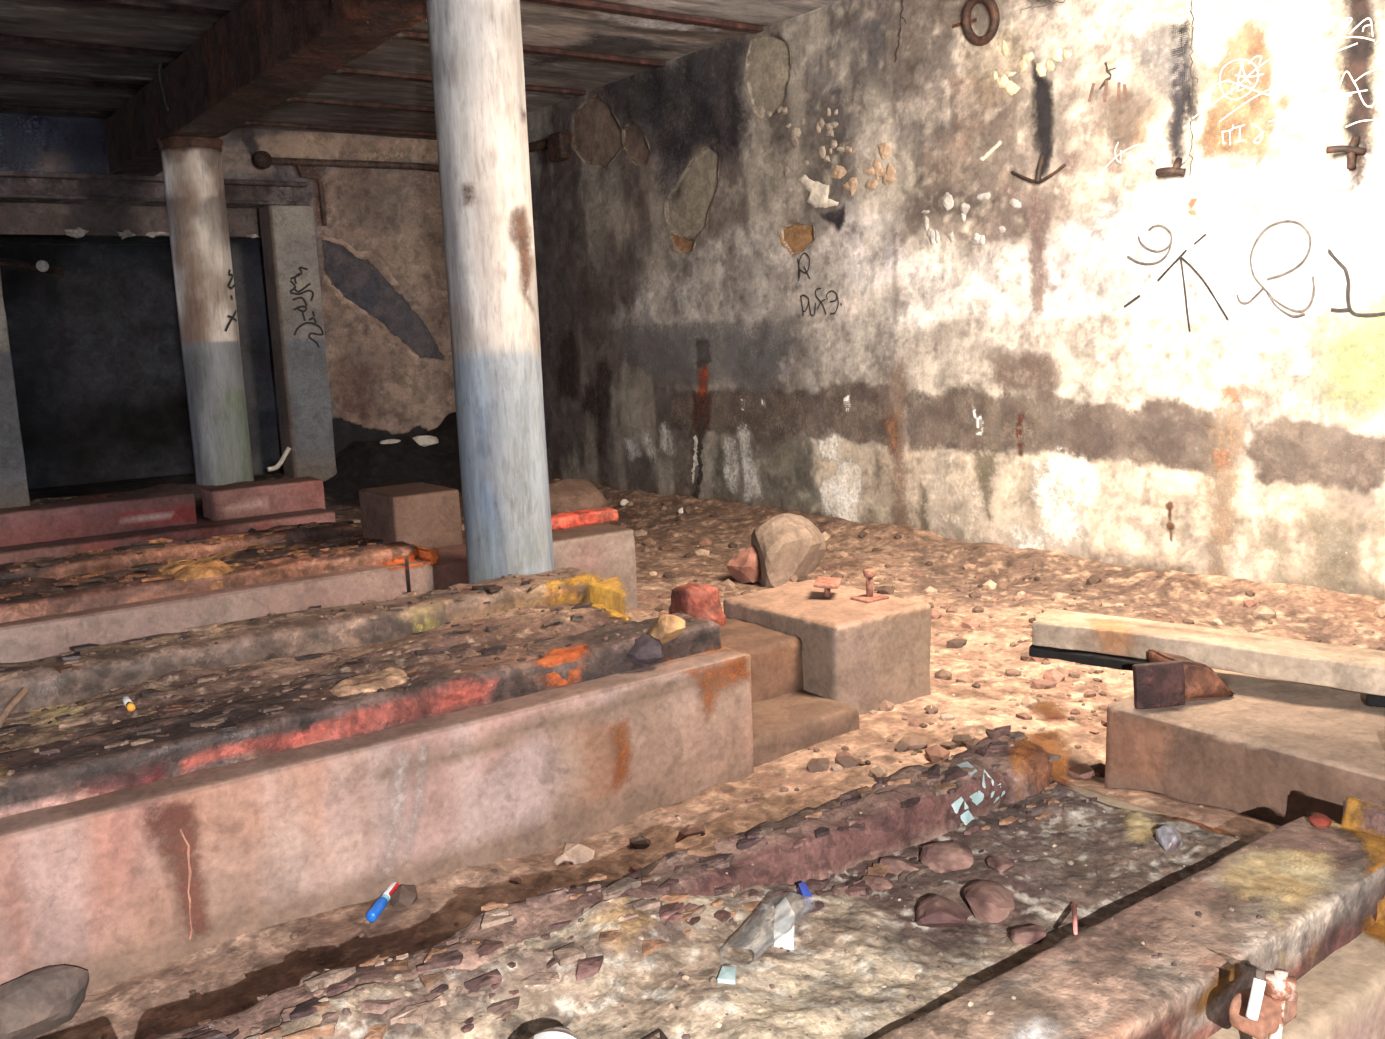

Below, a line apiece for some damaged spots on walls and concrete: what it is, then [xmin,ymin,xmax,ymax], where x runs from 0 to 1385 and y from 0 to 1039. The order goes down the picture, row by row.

leakage [1345,0,1375,33]
flaking render [571,95,623,168]
flaking render [664,146,720,254]
flaking render [745,33,897,257]
leakage [1351,154,1365,188]
flaking render [320,235,444,362]
corrosion [511,209,533,299]
leakage [557,322,1217,550]
leakage [1245,417,1385,493]
corrosion [147,804,207,939]
corrosion [1329,796,1385,874]
corrosion [1364,896,1385,943]